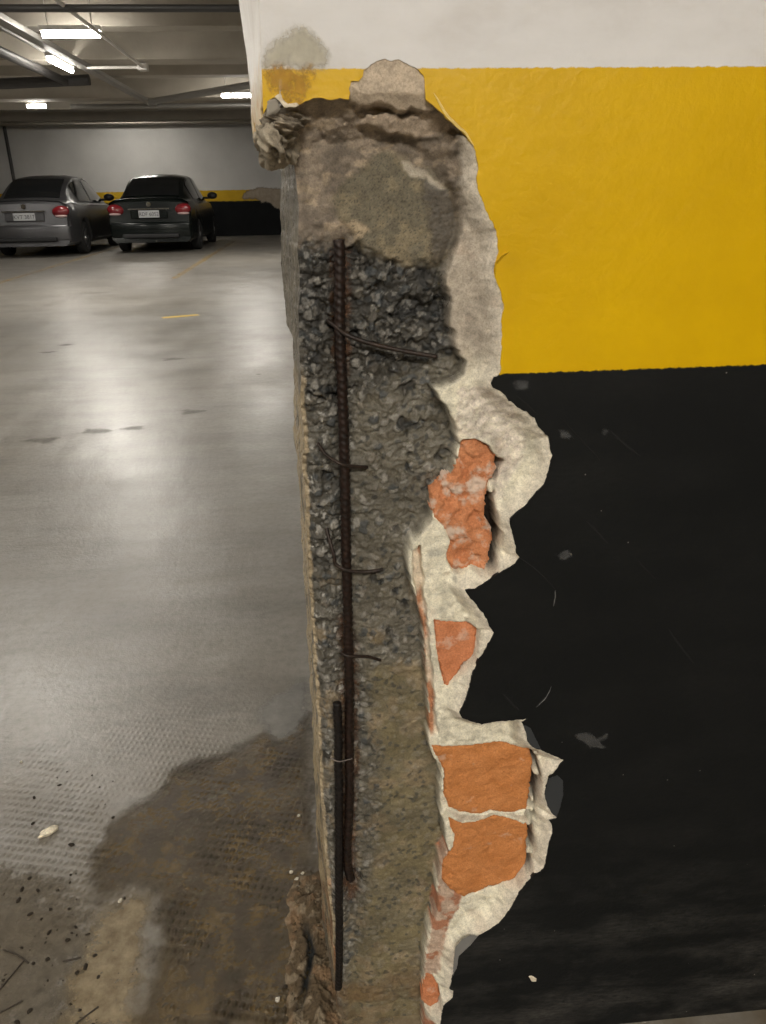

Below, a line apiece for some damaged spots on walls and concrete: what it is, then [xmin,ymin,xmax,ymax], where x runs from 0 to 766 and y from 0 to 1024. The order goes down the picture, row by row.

water stain [92,683,315,1024]
spalling [242,59,563,1024]